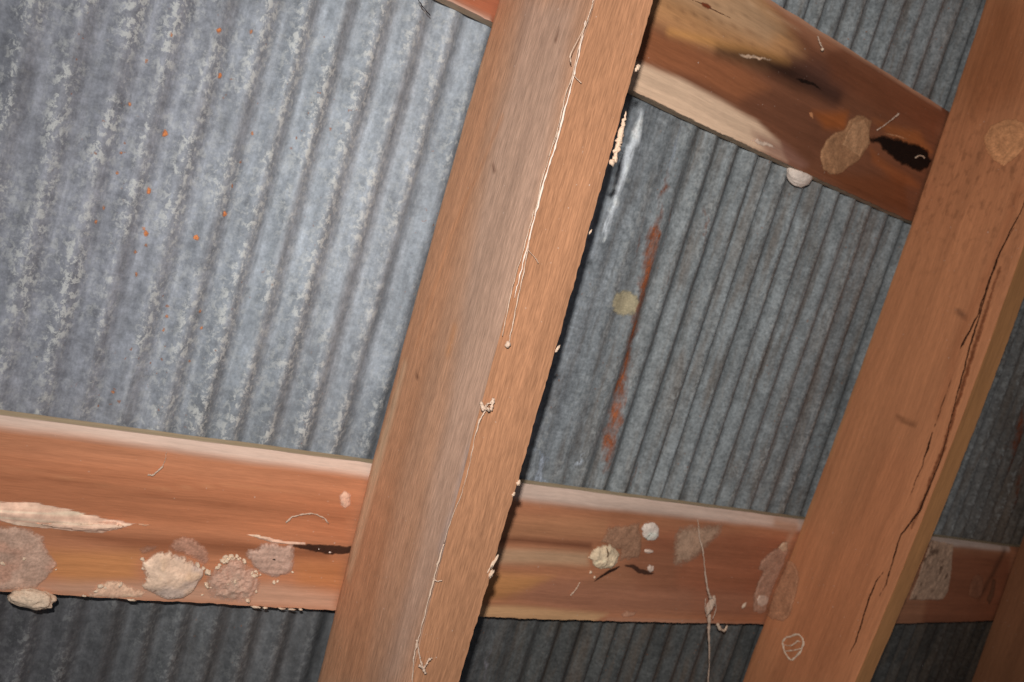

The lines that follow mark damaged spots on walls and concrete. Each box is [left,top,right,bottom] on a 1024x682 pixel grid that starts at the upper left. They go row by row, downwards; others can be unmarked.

rust [603,225,661,462]
crack [851,203,1024,650]